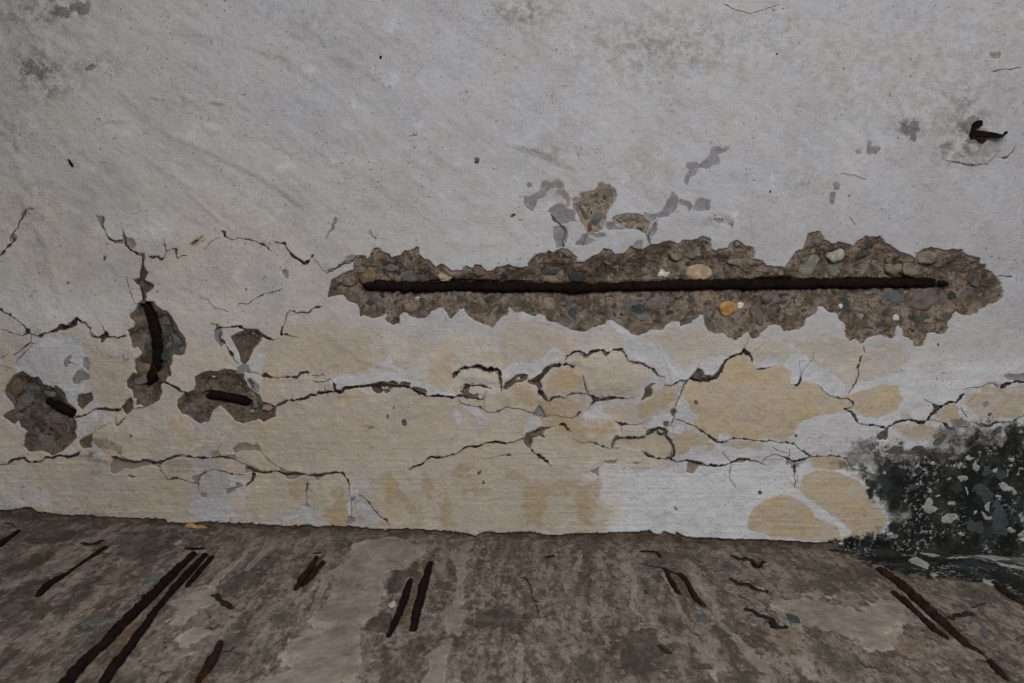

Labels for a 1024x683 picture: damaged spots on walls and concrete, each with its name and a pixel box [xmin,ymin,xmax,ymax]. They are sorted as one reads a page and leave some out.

peeling [684,147,730,185]
spalling [3,336,99,456]
crack [0,309,129,368]
crack [0,405,149,465]
spalling [112,237,186,415]
spalling [177,327,276,424]
crack [102,217,357,304]
crack [111,445,389,524]
crack [201,288,879,488]
spalling [327,180,1002,401]
leakage [748,386,1024,600]
crack [794,345,1024,466]